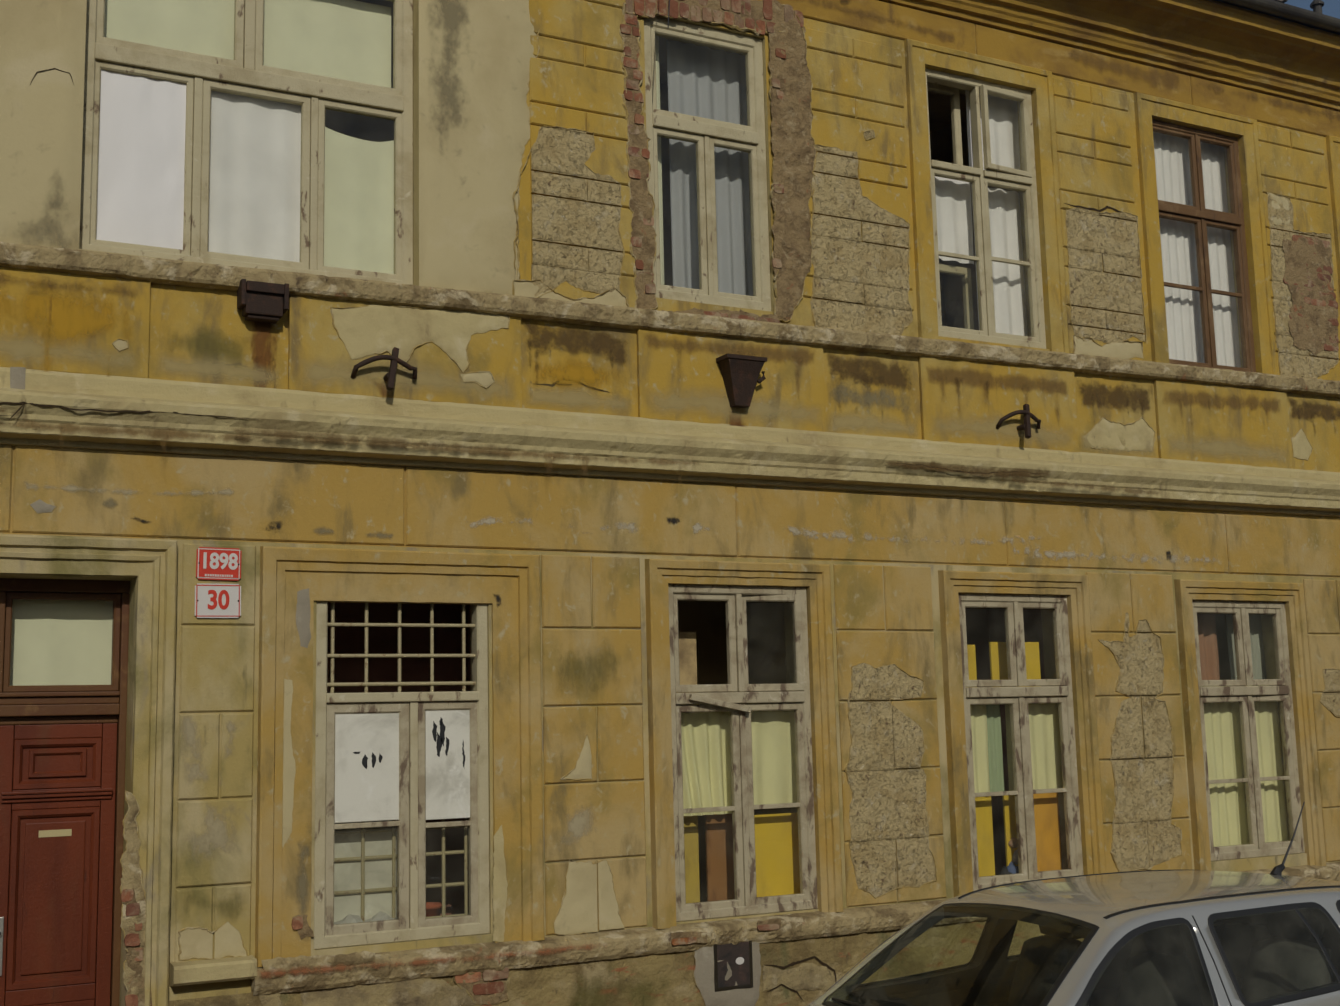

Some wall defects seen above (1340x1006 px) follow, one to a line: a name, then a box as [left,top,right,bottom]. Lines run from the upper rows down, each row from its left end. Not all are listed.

flaking render [512,0,913,336]
corrosion [252,321,275,388]
flaking render [330,305,510,388]
damp [527,324,625,366]
flaking render [1065,207,1147,359]
flaking render [1267,192,1339,379]
flaking render [845,663,938,898]
flaking render [1098,612,1182,872]
flaking render [120,790,152,1006]
flaking render [178,915,375,1006]
flaking render [553,859,625,935]
crack [767,956,837,999]